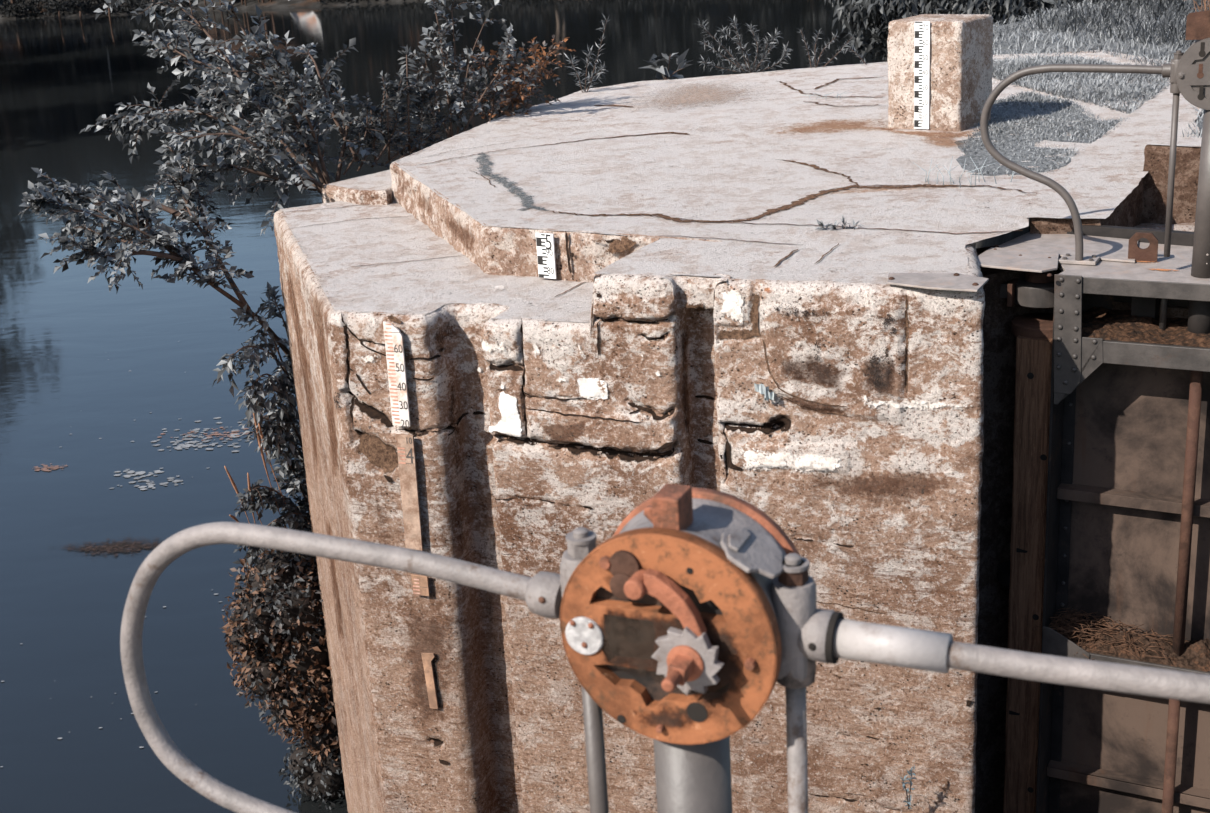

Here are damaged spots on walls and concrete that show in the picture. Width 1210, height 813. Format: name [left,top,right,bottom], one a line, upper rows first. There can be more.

crack [779,77,878,106]
crack [415,105,1029,297]
crack [341,313,484,442]
leakage [781,336,838,387]
leakage [865,347,893,394]
peeling [487,385,522,437]
spalling [768,416,791,437]
spalling [725,441,735,469]